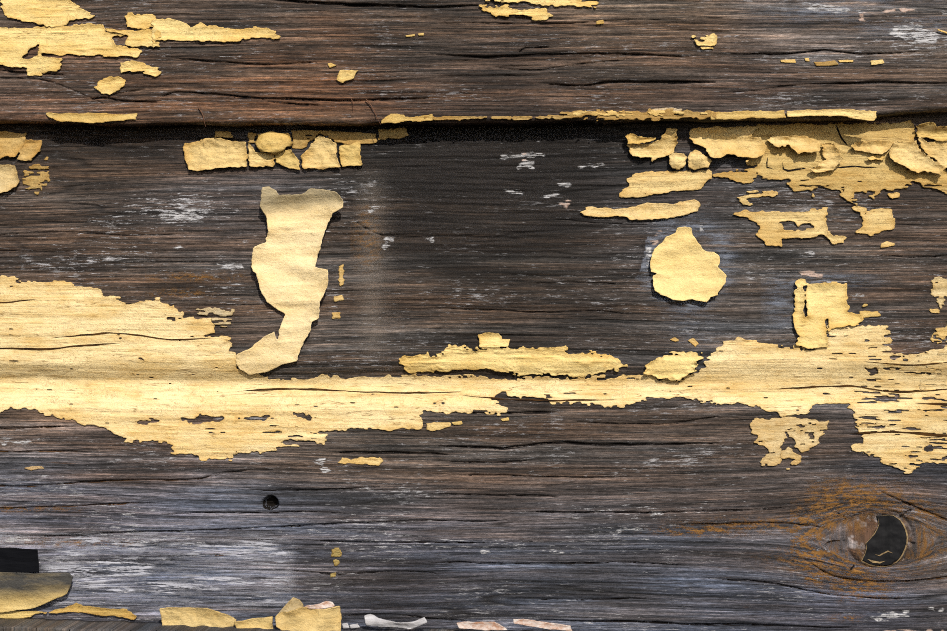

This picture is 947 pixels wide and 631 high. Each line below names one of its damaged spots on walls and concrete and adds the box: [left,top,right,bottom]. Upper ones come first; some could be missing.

peeling [0,0,281,95]
peeling [479,0,598,21]
peeling [0,131,50,195]
peeling [183,107,947,302]
peeling [0,186,947,474]
peeling [0,537,137,620]